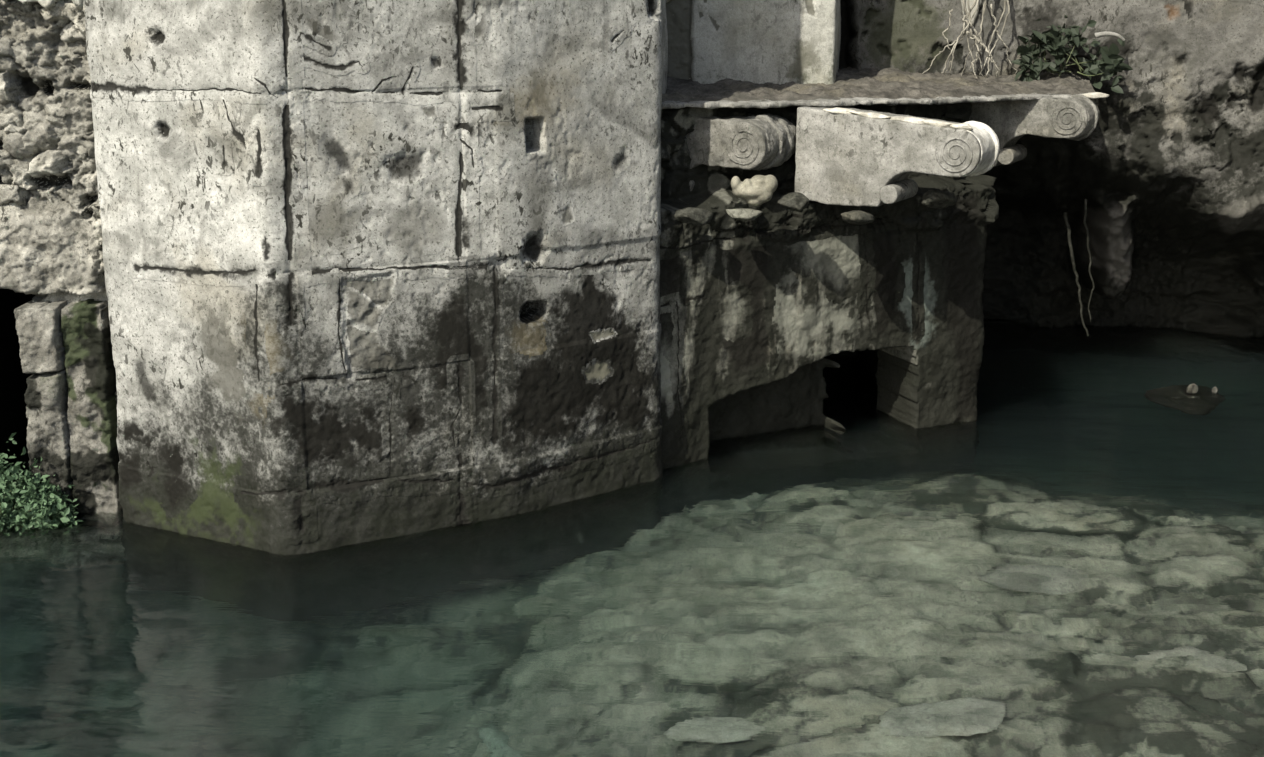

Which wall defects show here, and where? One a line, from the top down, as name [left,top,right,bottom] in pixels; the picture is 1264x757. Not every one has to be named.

spalling [2,70,91,105]
spalling [23,171,98,221]
water stain [129,353,161,407]
water stain [181,287,302,438]
water stain [502,302,551,378]
water stain [659,214,906,411]
water stain [933,183,995,423]
water stain [384,396,442,459]
water stain [116,431,200,521]